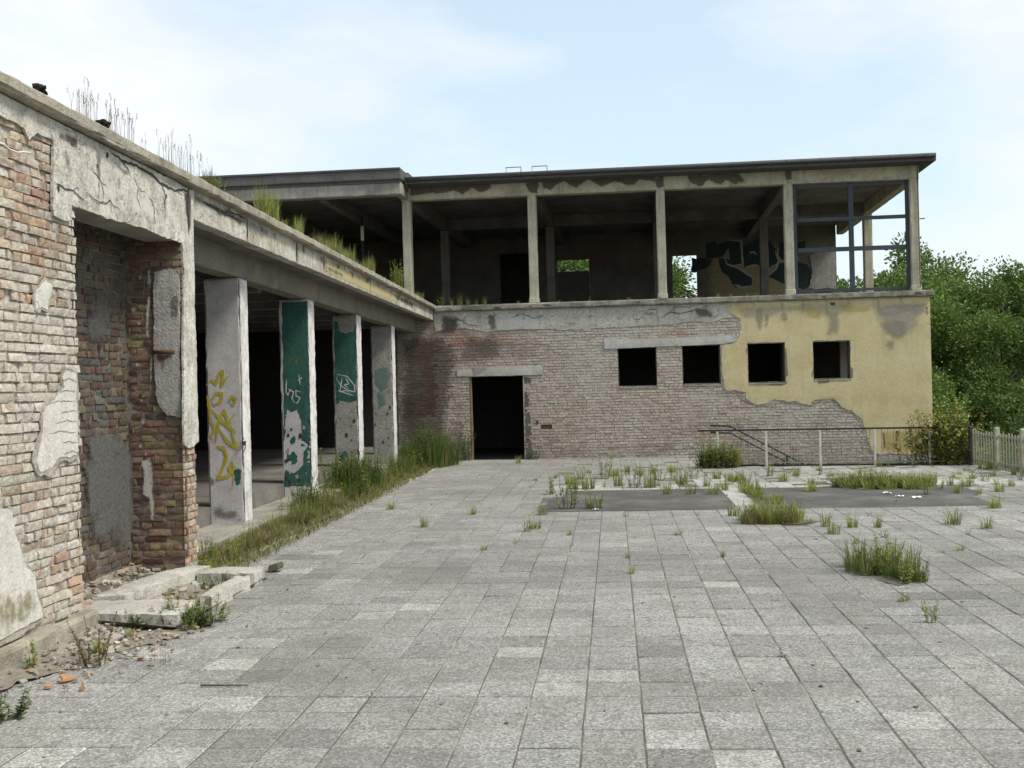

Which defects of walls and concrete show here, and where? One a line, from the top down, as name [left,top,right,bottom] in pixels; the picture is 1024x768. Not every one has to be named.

crack [55,151,248,236]
peeling [282,301,312,487]
peeling [334,321,357,464]